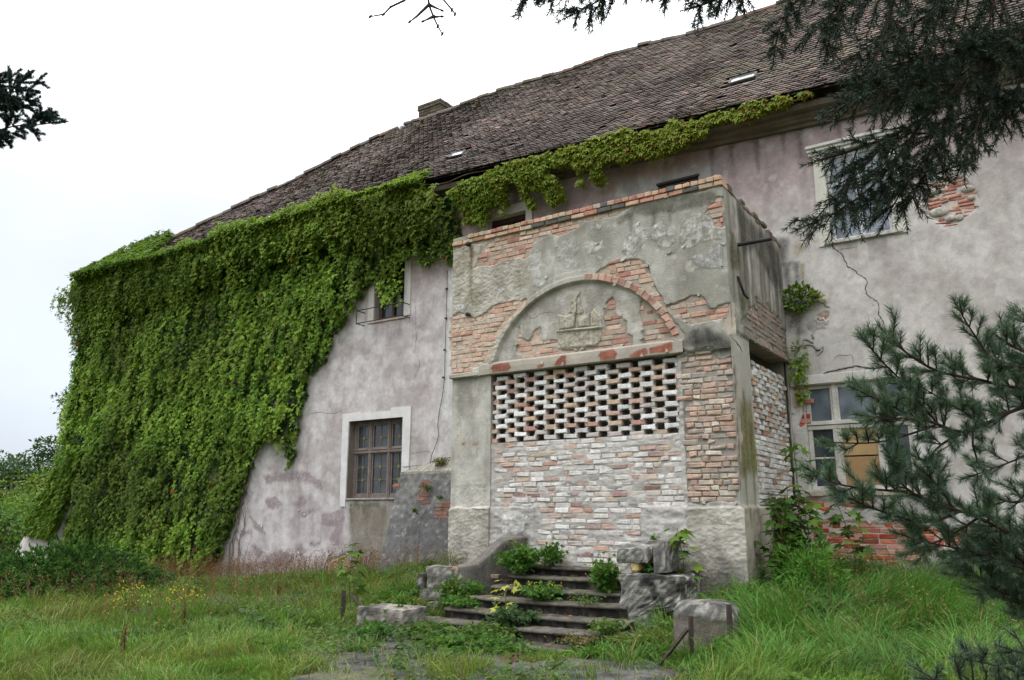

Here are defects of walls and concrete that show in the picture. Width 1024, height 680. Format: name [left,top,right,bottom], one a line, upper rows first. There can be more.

flaking render [922,175,979,227]
flaking render [447,174,790,375]
crack [833,246,884,324]
flaking render [416,479,451,519]
flaking render [799,498,981,566]